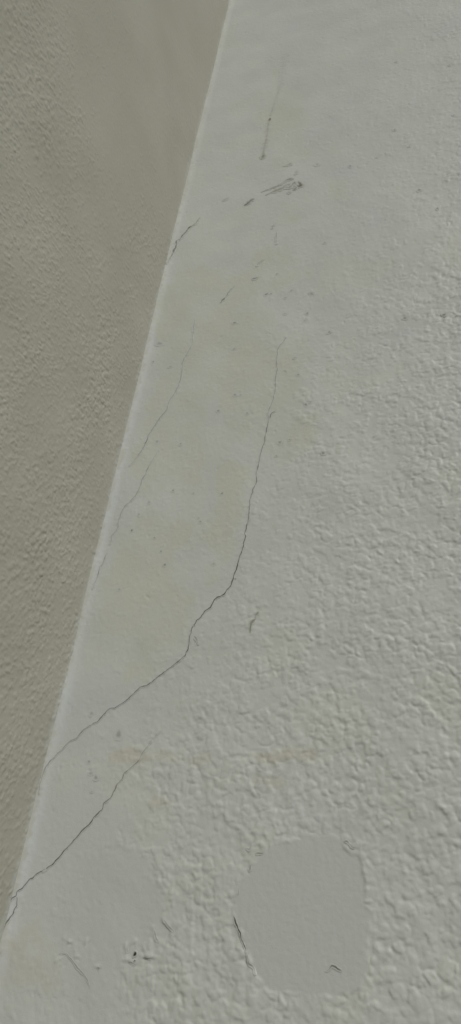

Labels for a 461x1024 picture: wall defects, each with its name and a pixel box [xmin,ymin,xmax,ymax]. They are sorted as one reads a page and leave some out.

crack [38,319,287,795]
crack [0,730,162,952]